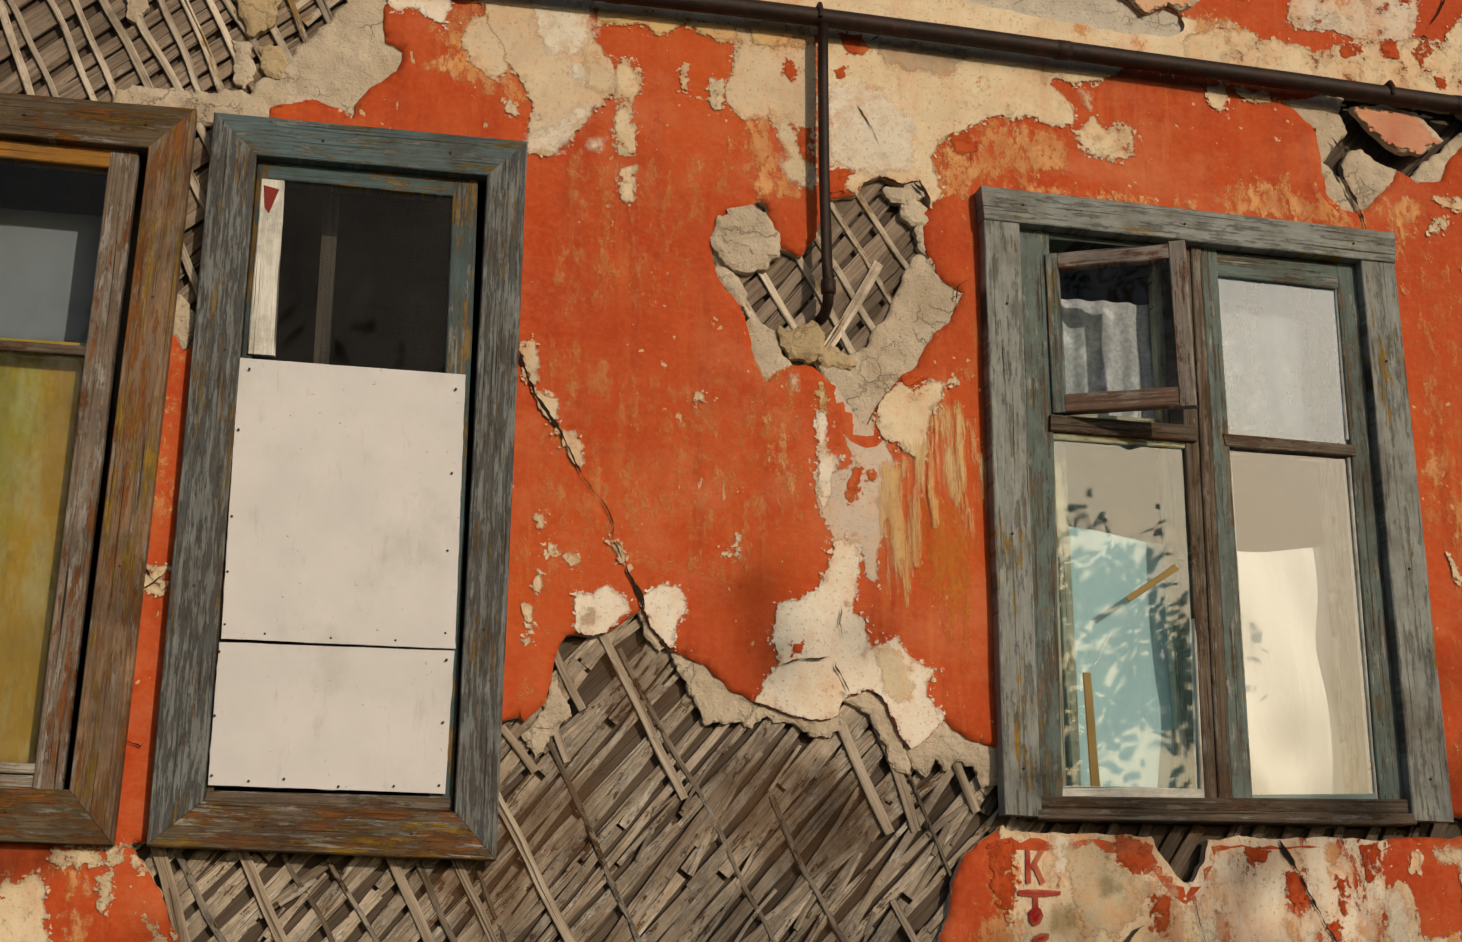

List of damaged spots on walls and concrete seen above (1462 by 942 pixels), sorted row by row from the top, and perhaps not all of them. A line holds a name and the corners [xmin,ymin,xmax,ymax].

spalling [0,0,819,355]
peeling [763,0,1462,261]
peeling [710,28,1123,590]
peeling [520,509,581,646]
peeling [519,333,585,472]
crack [519,352,645,609]
peeling [690,390,707,408]
peeling [1421,430,1462,586]
peeling [130,532,1462,942]
peeling [0,867,53,942]
peeling [46,842,145,917]
crack [1279,840,1337,942]